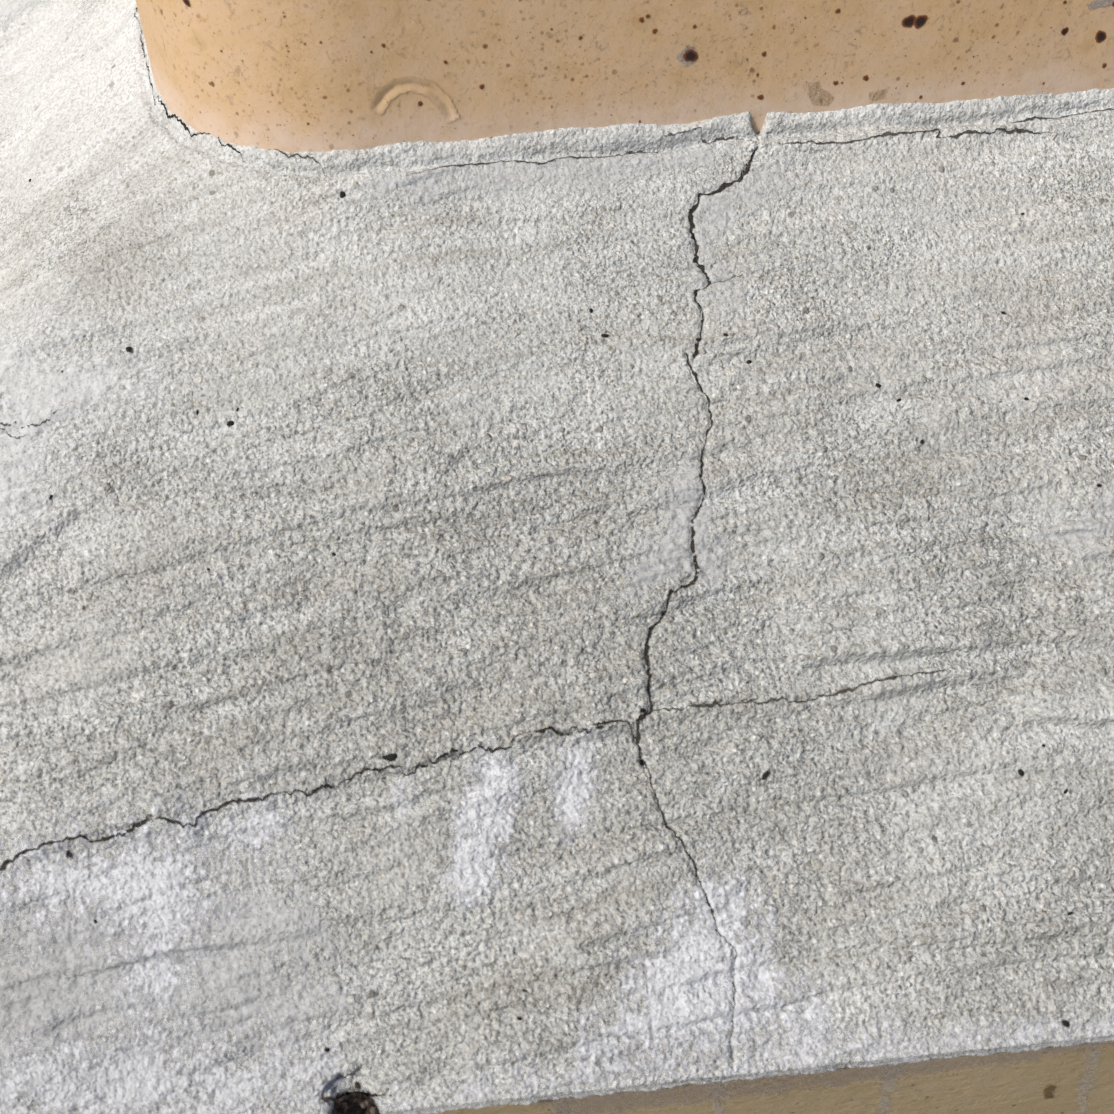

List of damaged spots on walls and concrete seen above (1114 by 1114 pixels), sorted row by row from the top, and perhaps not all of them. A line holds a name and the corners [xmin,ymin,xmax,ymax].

crack [134,7,326,176]
crack [781,108,1114,144]
crack [0,127,952,1064]